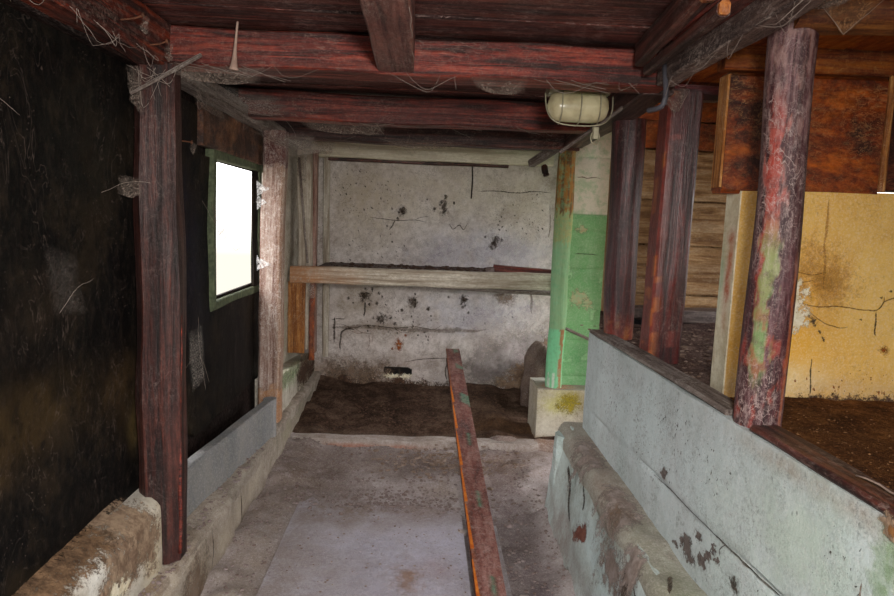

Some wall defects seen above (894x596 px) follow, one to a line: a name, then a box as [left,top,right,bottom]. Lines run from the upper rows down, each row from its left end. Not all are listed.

damp [347,288,396,332]
peeling [792,277,813,335]
crack [798,272,894,328]
peeling [86,498,161,596]
spalling [672,529,720,571]